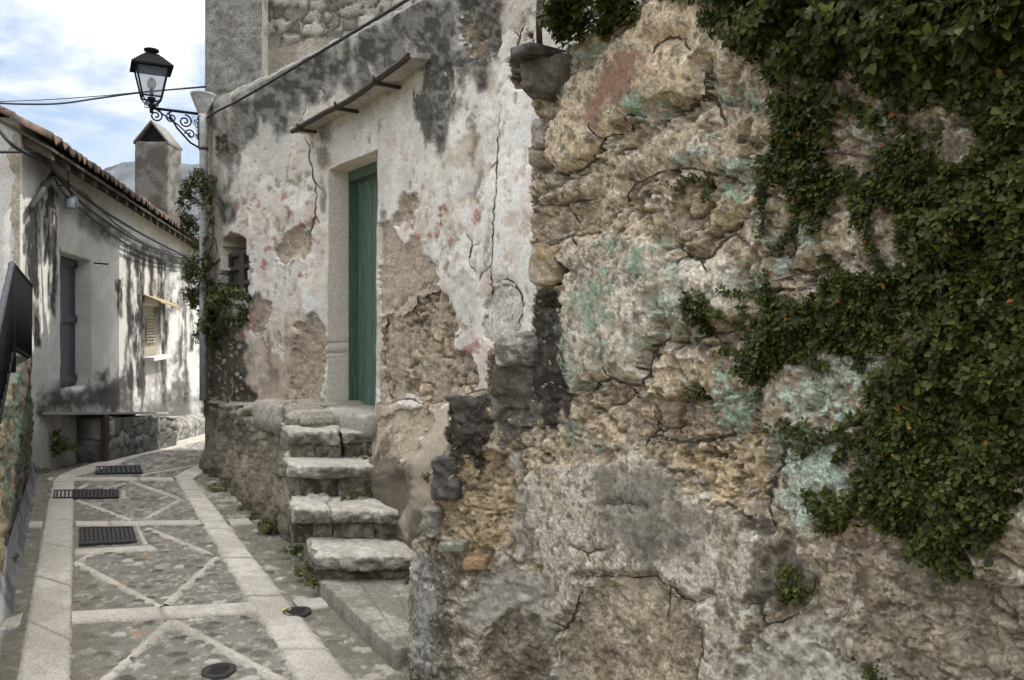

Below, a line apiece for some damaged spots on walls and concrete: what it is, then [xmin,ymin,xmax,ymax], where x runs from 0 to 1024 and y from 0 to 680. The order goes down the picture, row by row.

flaking render [261,193,313,278]
flaking render [292,312,328,402]
crack [302,88,337,245]
leakage [211,0,502,224]
flaking render [371,192,480,469]
crack [466,110,524,323]
flaking render [484,279,525,343]
crack [554,539,711,633]